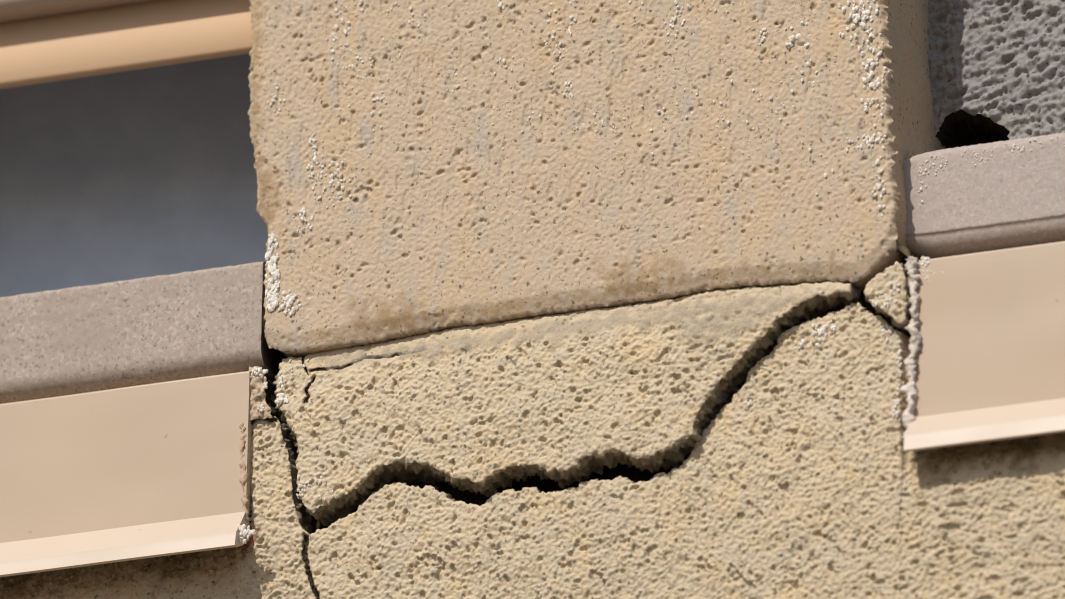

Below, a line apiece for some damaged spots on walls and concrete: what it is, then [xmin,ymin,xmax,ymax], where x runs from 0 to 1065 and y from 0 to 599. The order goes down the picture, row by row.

crack [823,291,901,331]
crack [282,349,424,403]
crack [408,463,683,506]
crack [301,514,328,599]